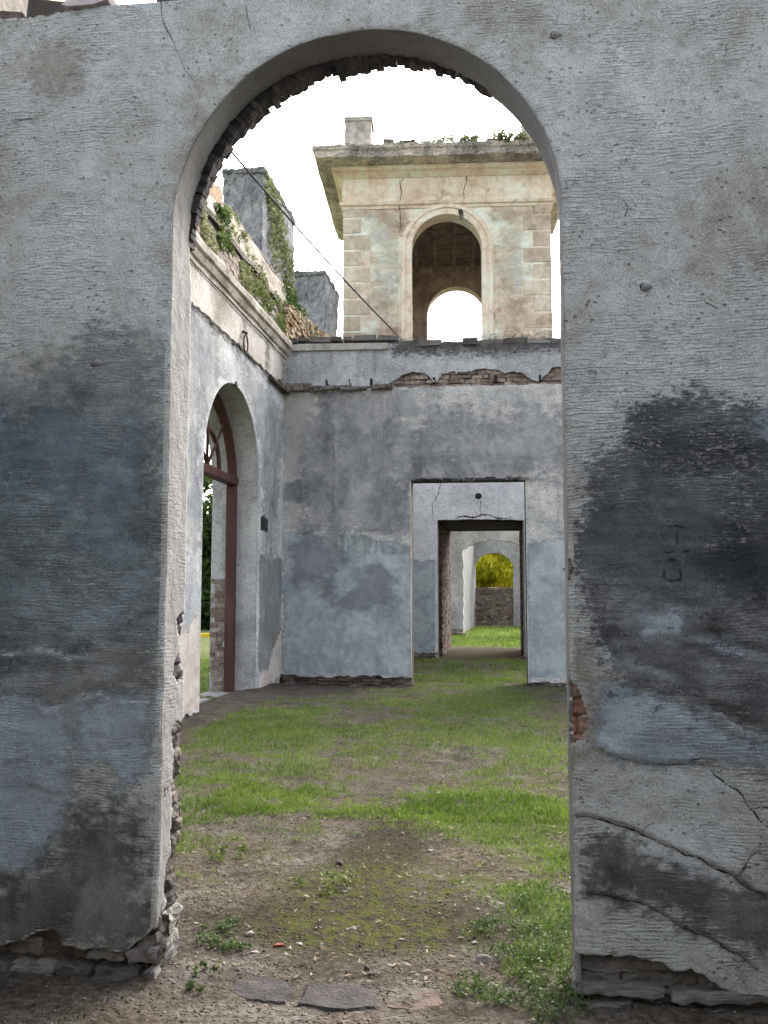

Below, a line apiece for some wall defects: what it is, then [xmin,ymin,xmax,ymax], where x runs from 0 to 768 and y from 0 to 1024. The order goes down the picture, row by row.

spalling [189,54,504,251]
spalling [268,367,562,395]
water stain [0,319,165,710]
crack [458,501,507,519]
water stain [240,339,768,750]
spalling [527,679,589,743]
peeling [148,579,225,968]
crack [601,750,768,828]
crack [578,816,768,896]
spalling [0,930,93,958]
spalling [581,955,719,993]
crack [588,893,749,964]